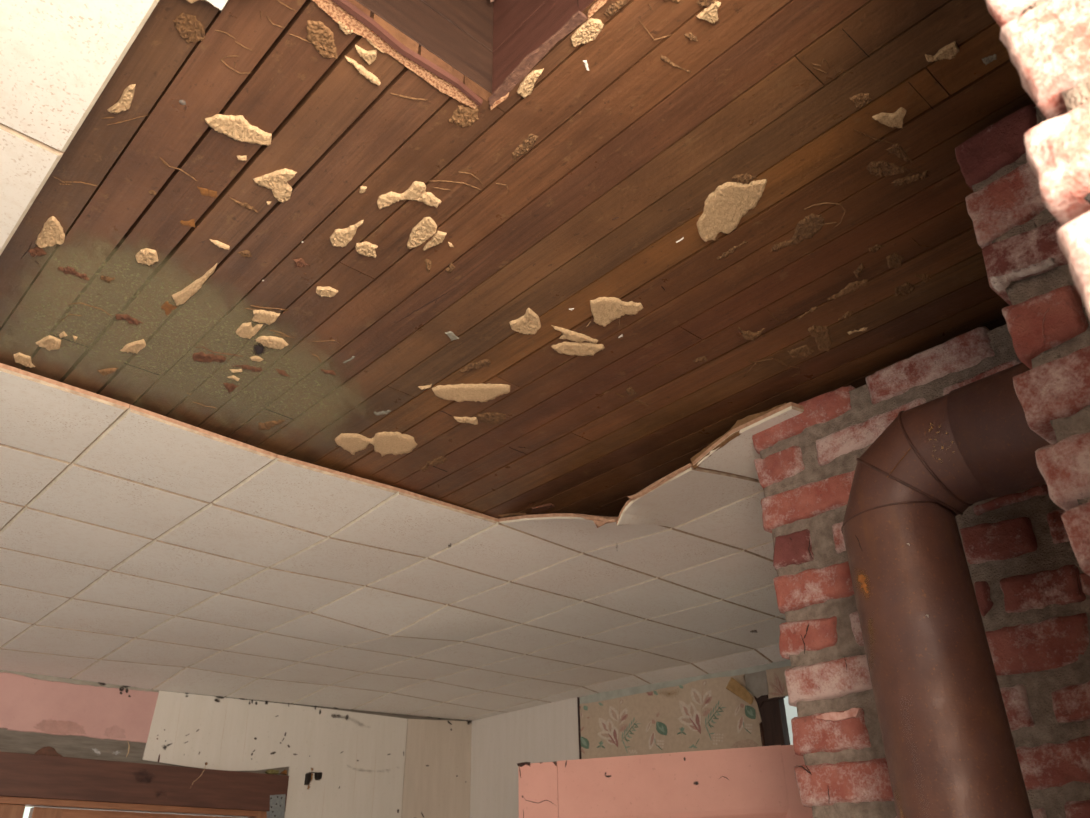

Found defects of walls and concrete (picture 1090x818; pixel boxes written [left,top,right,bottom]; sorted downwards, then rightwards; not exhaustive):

peeling [0,672,159,757]